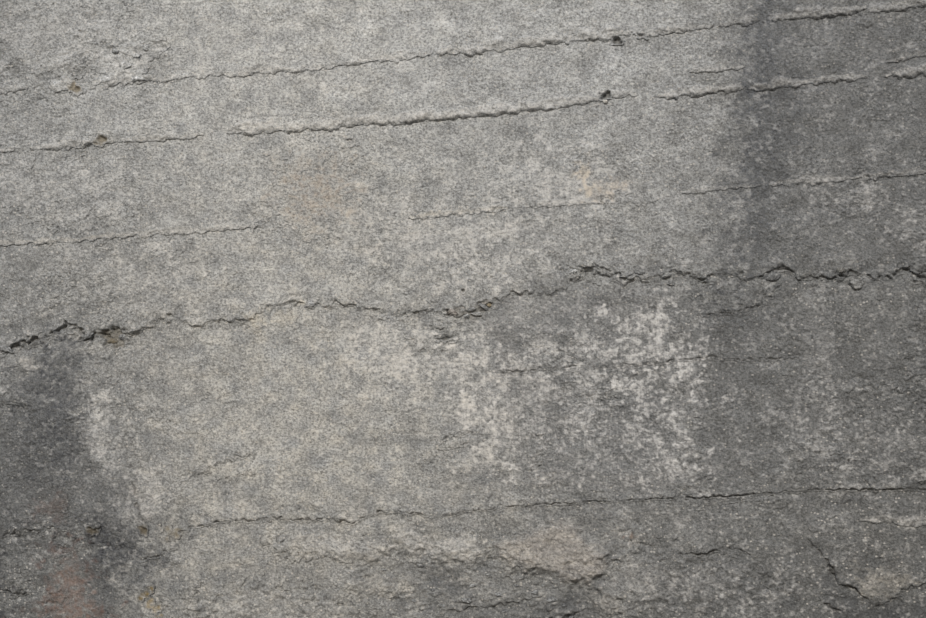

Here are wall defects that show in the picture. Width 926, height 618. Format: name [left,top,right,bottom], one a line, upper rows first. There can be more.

crack [0,261,926,358]
leakage [0,136,245,618]
crack [126,476,145,524]
crack [138,486,926,563]